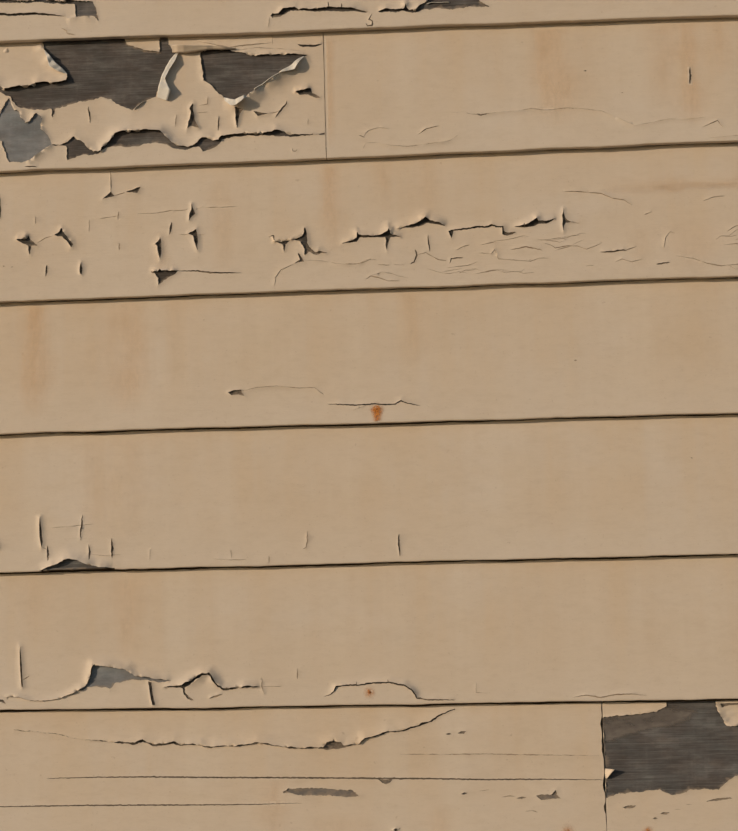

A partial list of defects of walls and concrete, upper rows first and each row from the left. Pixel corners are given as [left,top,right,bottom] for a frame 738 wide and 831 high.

peeling [268,0,489,27]
peeling [0,0,325,163]
crack [272,191,738,281]
peeling [43,559,109,570]
peeling [19,665,281,705]
peeling [603,701,738,802]
peeling [283,788,358,797]